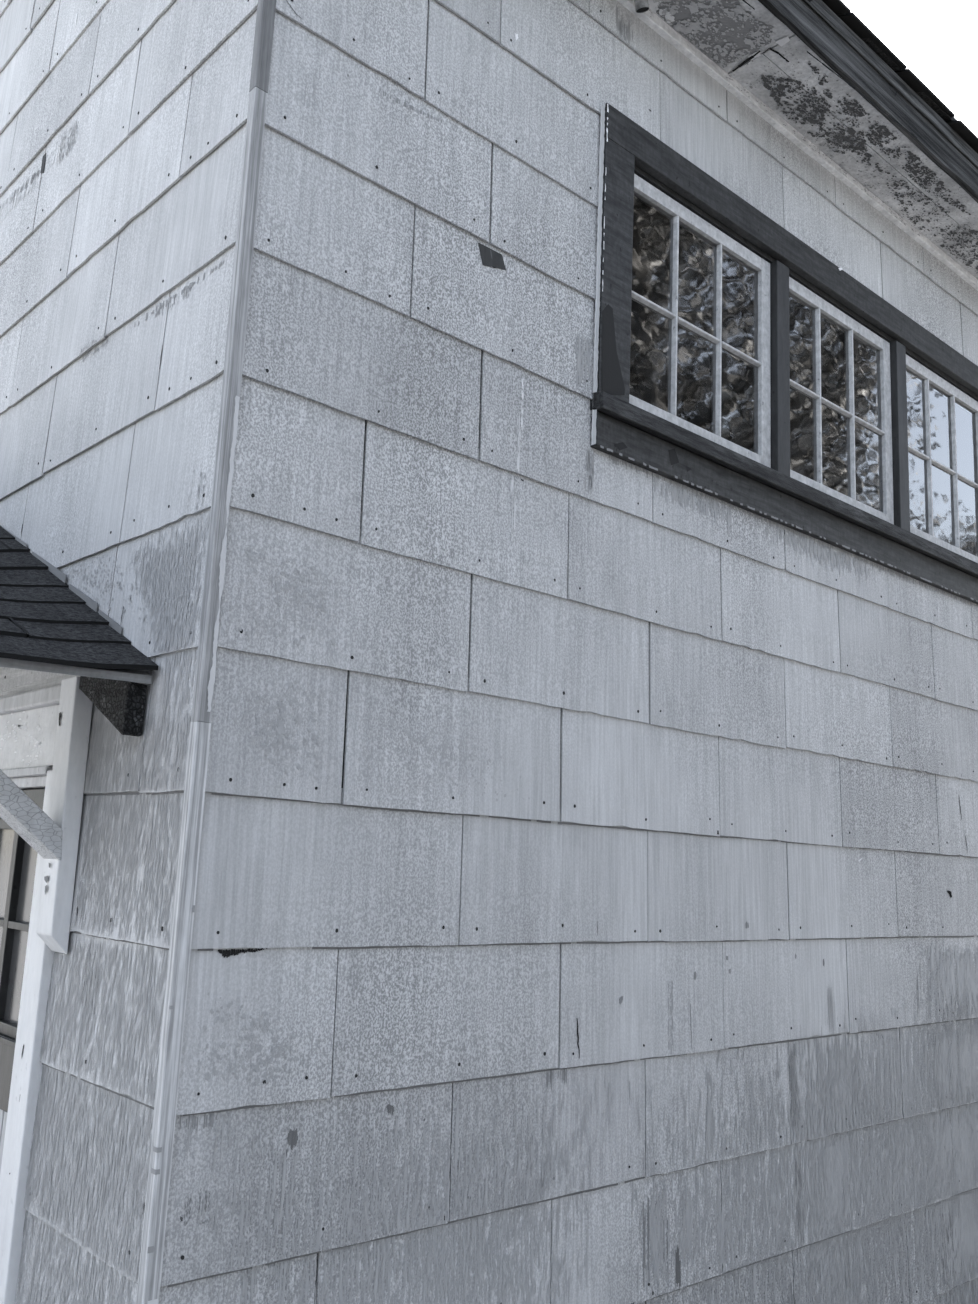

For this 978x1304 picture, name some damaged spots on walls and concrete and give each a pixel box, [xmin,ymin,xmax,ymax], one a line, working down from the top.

peeling [593,104,625,395]
peeling [648,0,978,274]
leakage [803,941,978,1304]